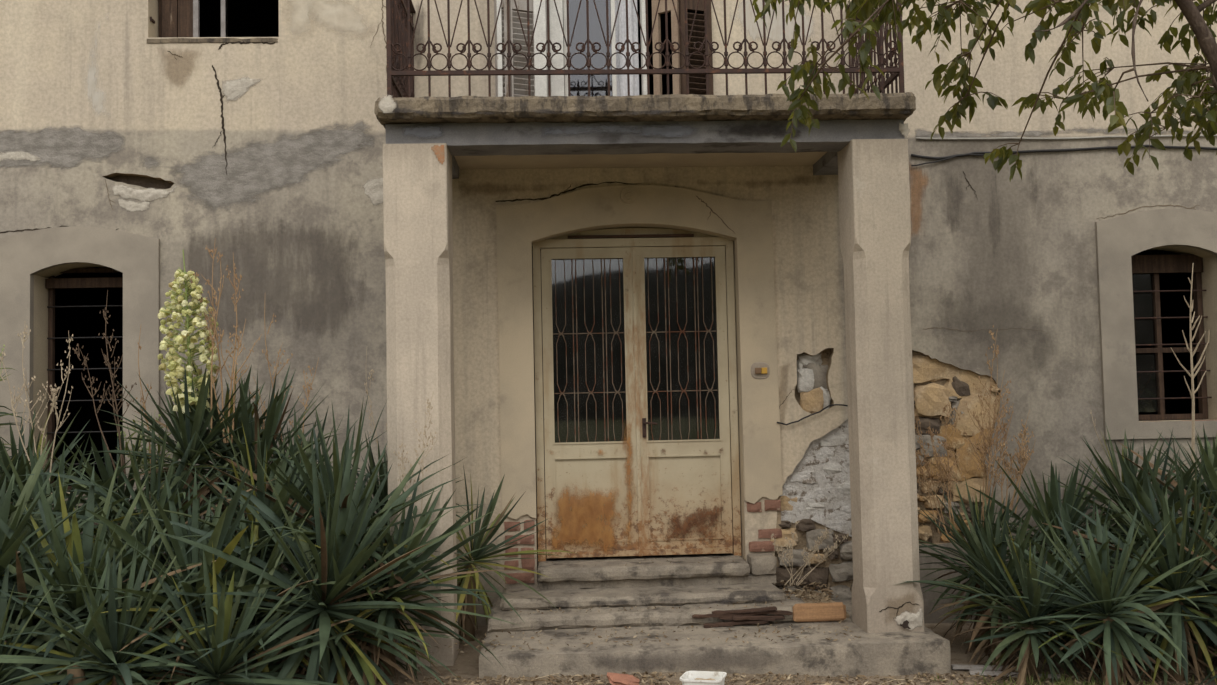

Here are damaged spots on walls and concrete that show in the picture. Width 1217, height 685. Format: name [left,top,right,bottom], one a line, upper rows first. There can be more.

peeling [108,121,374,212]
crack [496,182,642,202]
spalling [795,349,831,414]
rust [552,427,635,552]
flaking render [504,520,535,584]
rust [659,506,723,543]